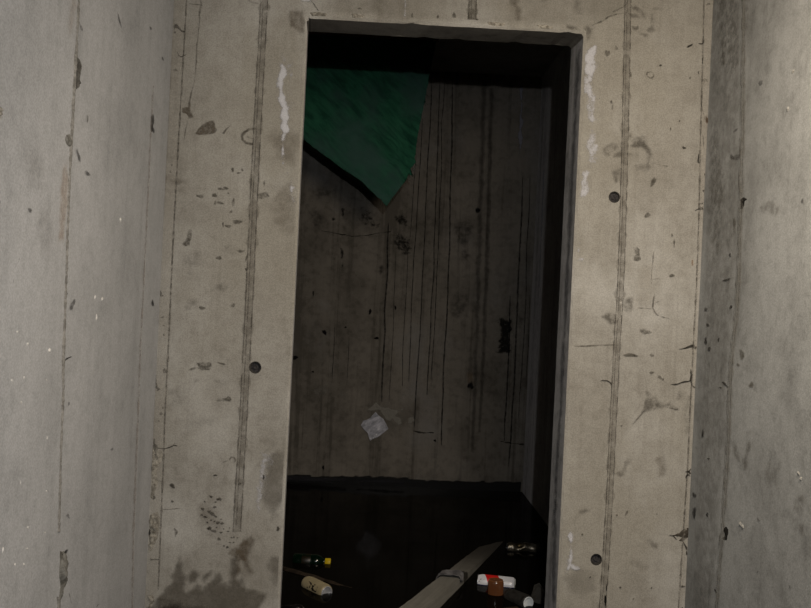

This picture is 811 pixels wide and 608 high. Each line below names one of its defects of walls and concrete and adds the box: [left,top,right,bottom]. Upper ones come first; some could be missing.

leakage [277,65,289,164]
leakage [565,45,598,319]
leakage [158,541,264,608]